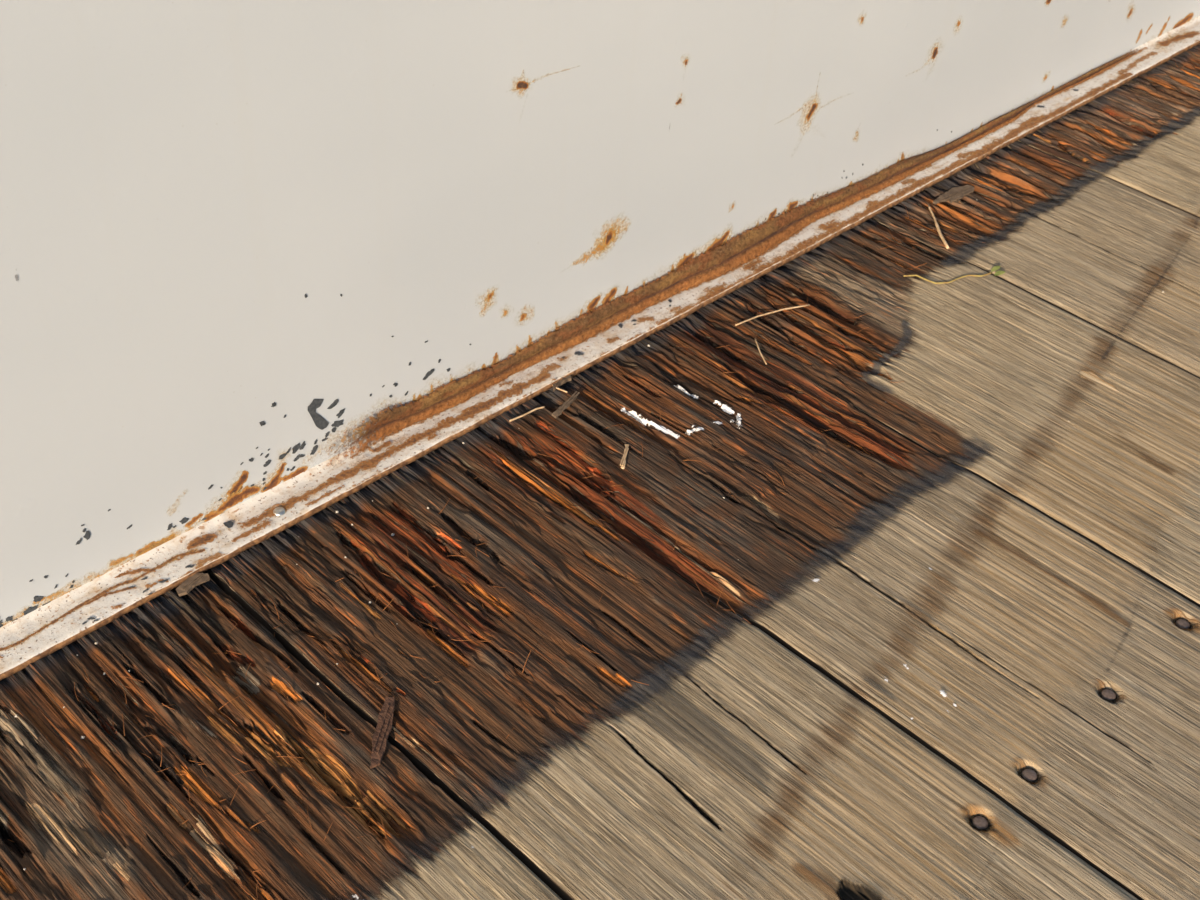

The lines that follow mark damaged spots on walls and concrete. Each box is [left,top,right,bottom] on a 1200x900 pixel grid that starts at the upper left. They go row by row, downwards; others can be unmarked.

leakage [942,108,1200,266]
rust [3,13,1199,626]
leakage [862,321,911,392]
leakage [1132,262,1200,337]
peeling [240,399,345,491]
peeling [0,574,74,628]
leakage [760,337,1200,900]
leakage [613,608,769,796]